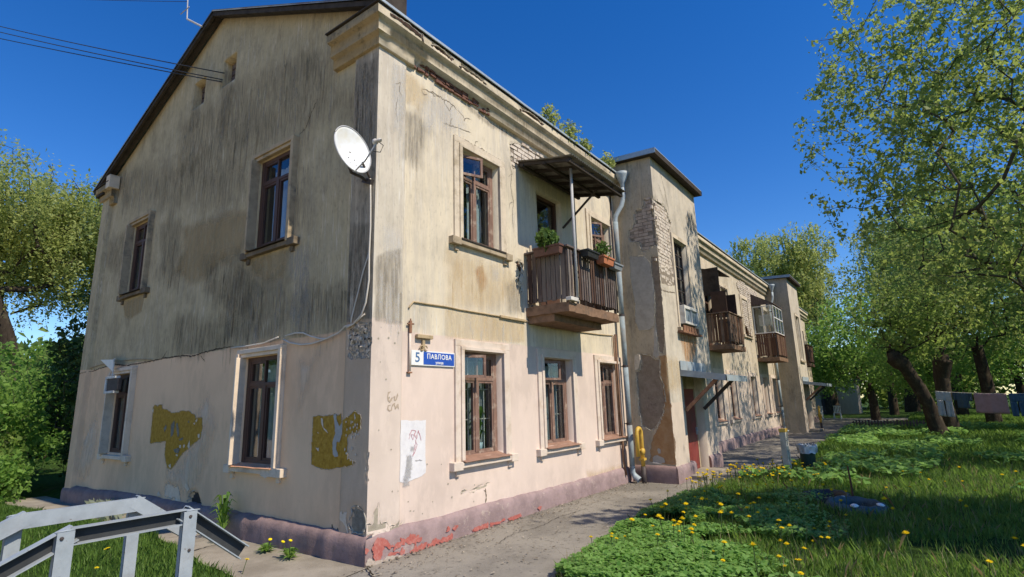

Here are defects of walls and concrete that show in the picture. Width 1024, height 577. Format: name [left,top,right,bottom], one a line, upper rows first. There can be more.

flaking render [510,142,547,183]
crack [89,346,234,372]
flaking render [347,321,399,363]
flaking render [627,197,676,465]
peeling [150,404,203,469]
peeling [311,410,370,481]
peeling [332,506,458,566]
peeling [472,513,522,532]